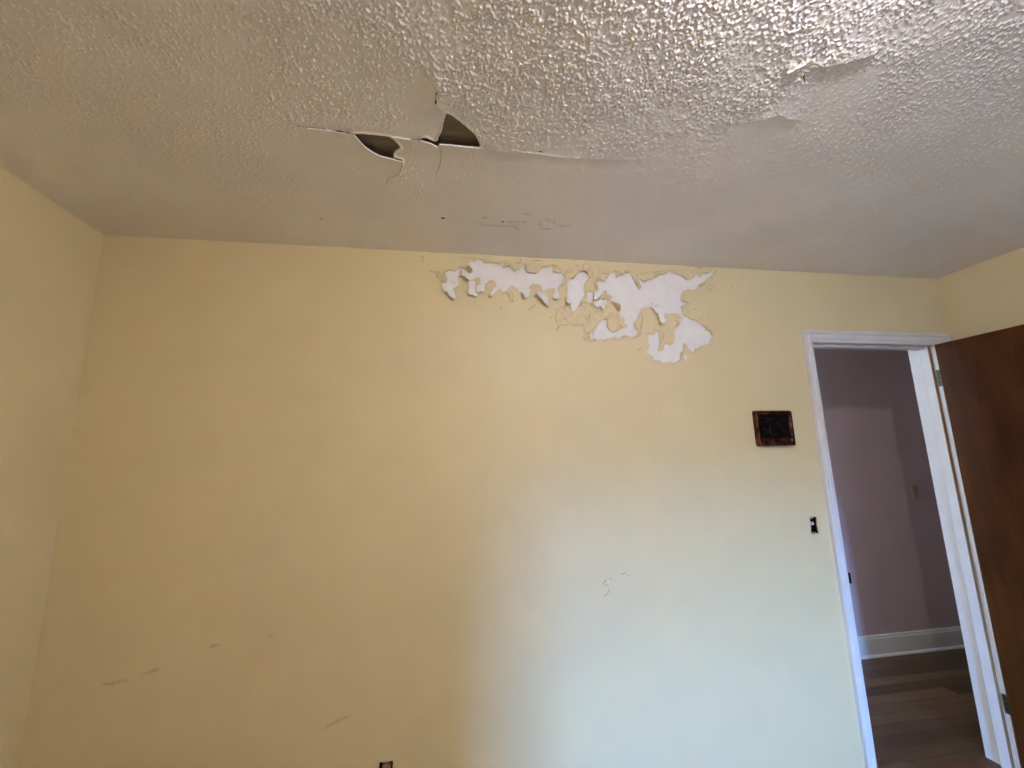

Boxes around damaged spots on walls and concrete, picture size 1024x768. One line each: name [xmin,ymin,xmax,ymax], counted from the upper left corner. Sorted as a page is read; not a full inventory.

crack [297,126,354,135]
crack [386,137,442,183]
peeling [421,255,719,366]